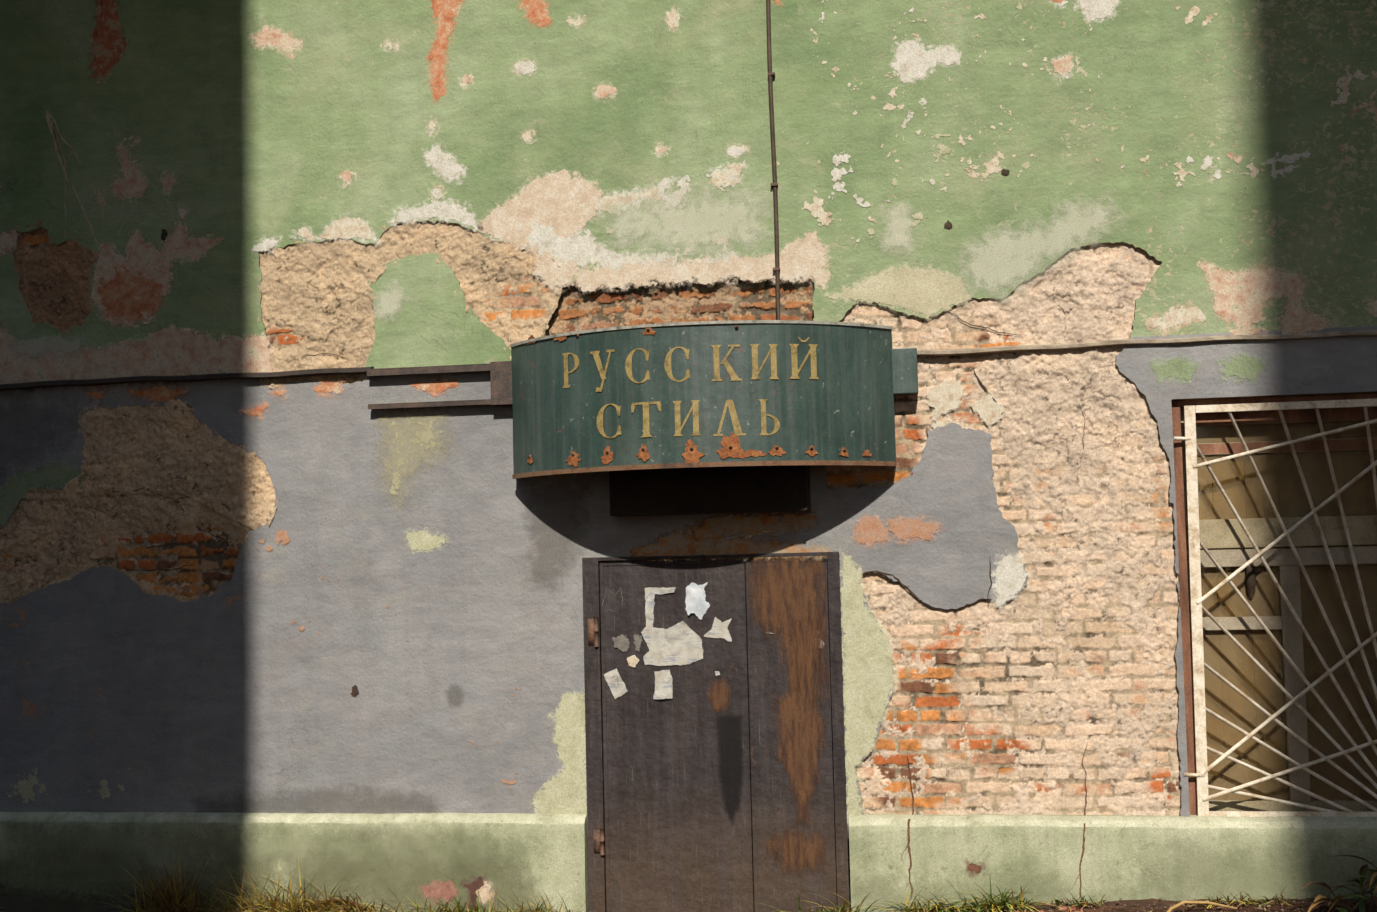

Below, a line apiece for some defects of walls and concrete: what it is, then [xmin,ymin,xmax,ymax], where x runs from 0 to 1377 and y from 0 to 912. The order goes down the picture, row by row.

flaking render [0,0,1036,628]
flaking render [825,243,1332,818]
flaking render [421,877,493,912]
flaking render [533,693,587,814]
crack [901,755,914,909]
crack [1072,746,1087,898]